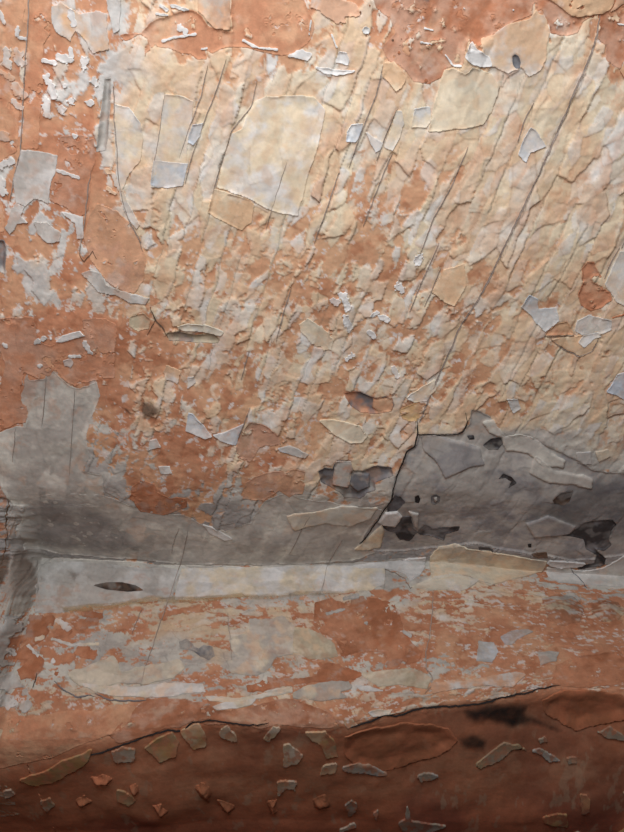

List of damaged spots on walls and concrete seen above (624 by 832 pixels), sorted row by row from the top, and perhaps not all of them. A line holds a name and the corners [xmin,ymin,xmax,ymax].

crack [113,86,142,249]
peeling [0,0,361,343]
crack [180,64,225,182]
crack [213,82,257,191]
peeling [346,0,624,153]
peeling [518,127,546,162]
crack [314,15,600,593]
spalling [521,251,624,356]
crack [1,501,10,563]
spalling [0,316,624,786]
crack [90,720,267,756]
peeling [398,806,446,832]